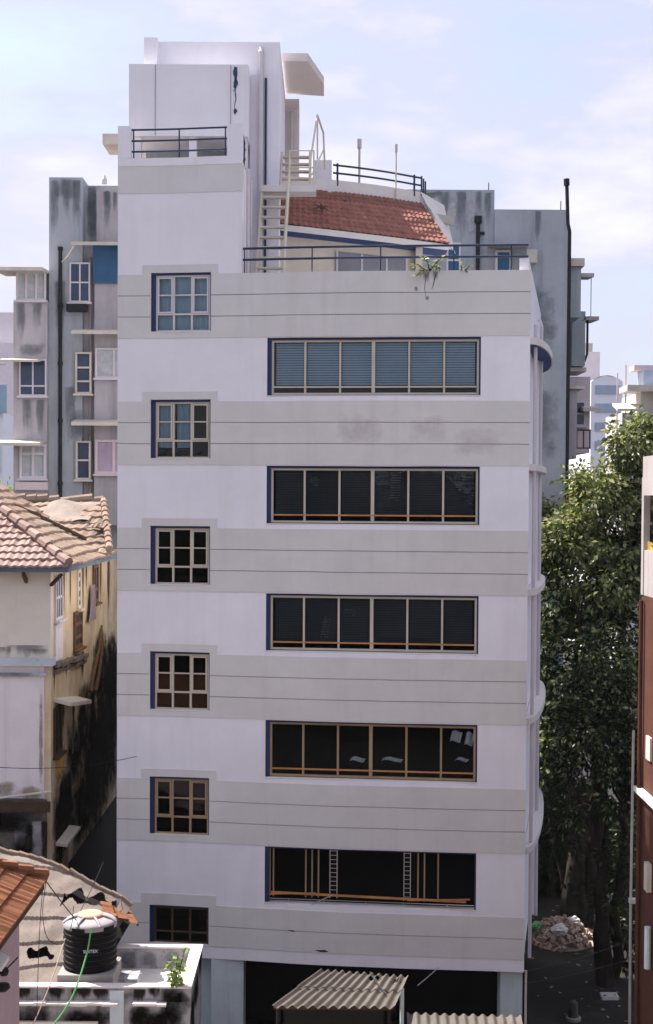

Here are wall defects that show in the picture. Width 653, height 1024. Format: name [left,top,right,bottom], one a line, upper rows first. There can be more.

damp [434,196,476,232]
damp [63,567,87,601]
damp [100,560,110,607]
damp [0,637,117,864]
damp [47,988,108,998]
damp [130,952,202,1024]
damp [19,1010,47,1021]
damp [64,1011,106,1024]